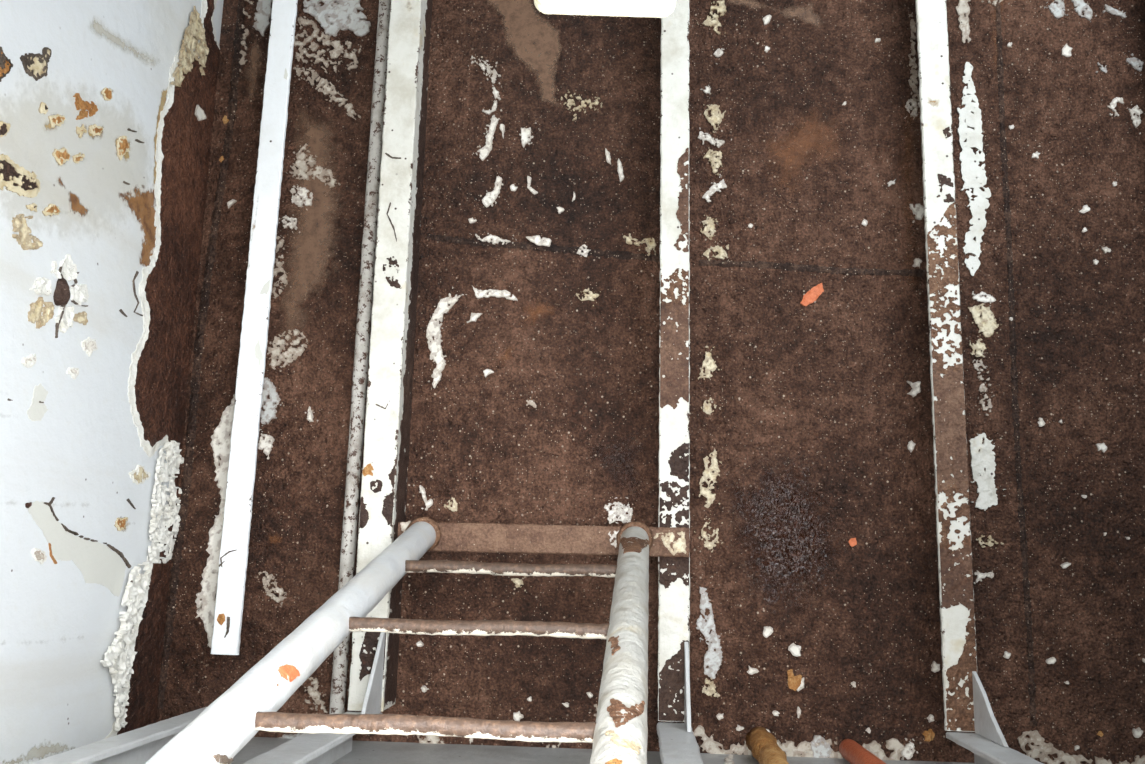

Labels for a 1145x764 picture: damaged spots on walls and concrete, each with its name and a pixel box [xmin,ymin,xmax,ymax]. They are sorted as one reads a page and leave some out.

rust [0,47,13,82]
peeling [20,47,52,81]
peeling [284,16,363,88]
peeling [345,103,361,120]
peeling [12,214,43,250]
rust [359,0,433,541]
peeling [972,353,995,416]
peeling [25,440,184,731]
rust [389,577,403,619]
rust [659,557,689,589]
rust [359,632,399,707]